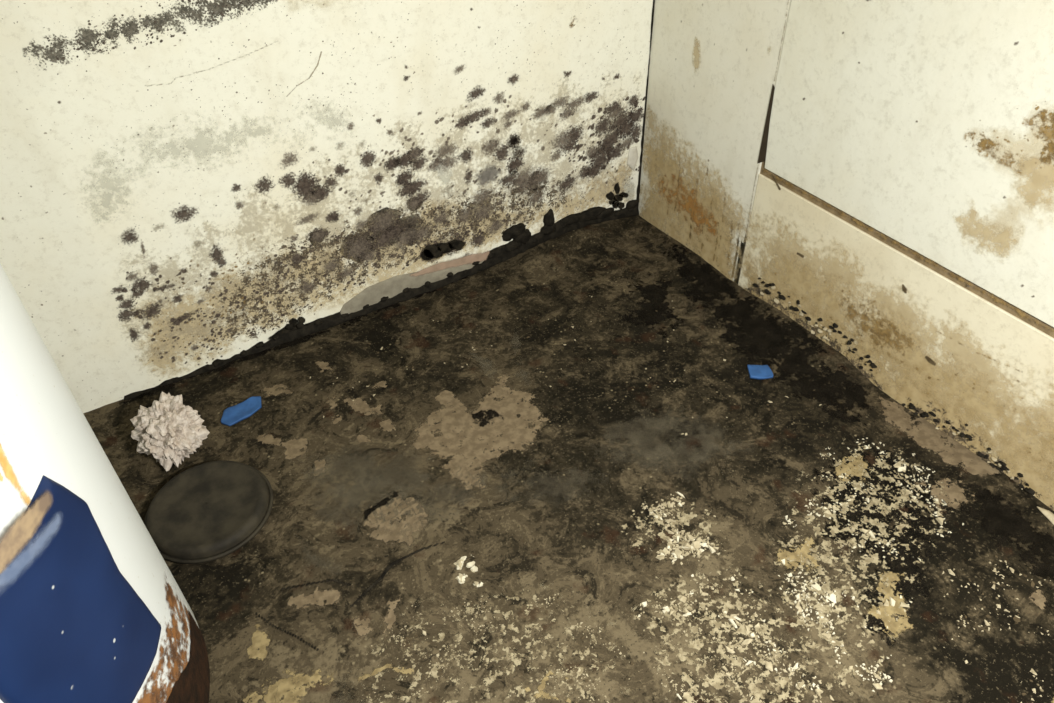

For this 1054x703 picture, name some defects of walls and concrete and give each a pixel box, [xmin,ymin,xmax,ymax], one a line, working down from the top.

damp [23,0,277,70]
damp [965,105,1054,205]
damp [112,74,645,373]
damp [956,209,1015,254]
damp [621,221,1054,511]
damp [960,489,1054,584]